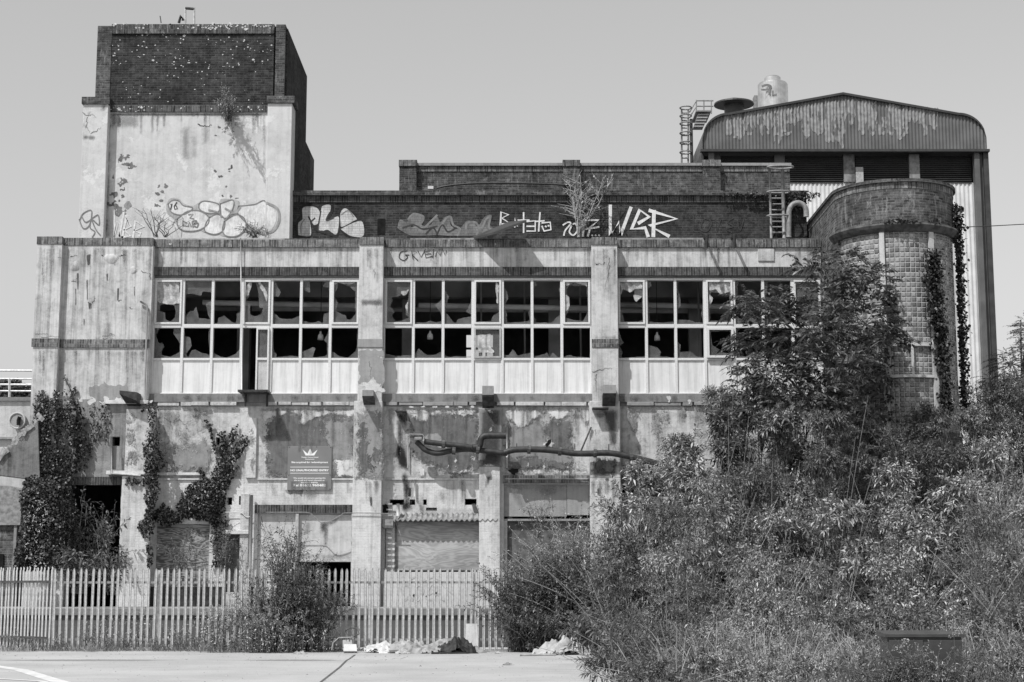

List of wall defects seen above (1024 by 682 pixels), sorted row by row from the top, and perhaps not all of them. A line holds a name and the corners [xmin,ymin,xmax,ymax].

peeling [724,99,939,149]
peeling [361,379,385,392]
peeling [409,406,493,422]
peeling [506,409,589,428]
peeling [447,447,604,475]